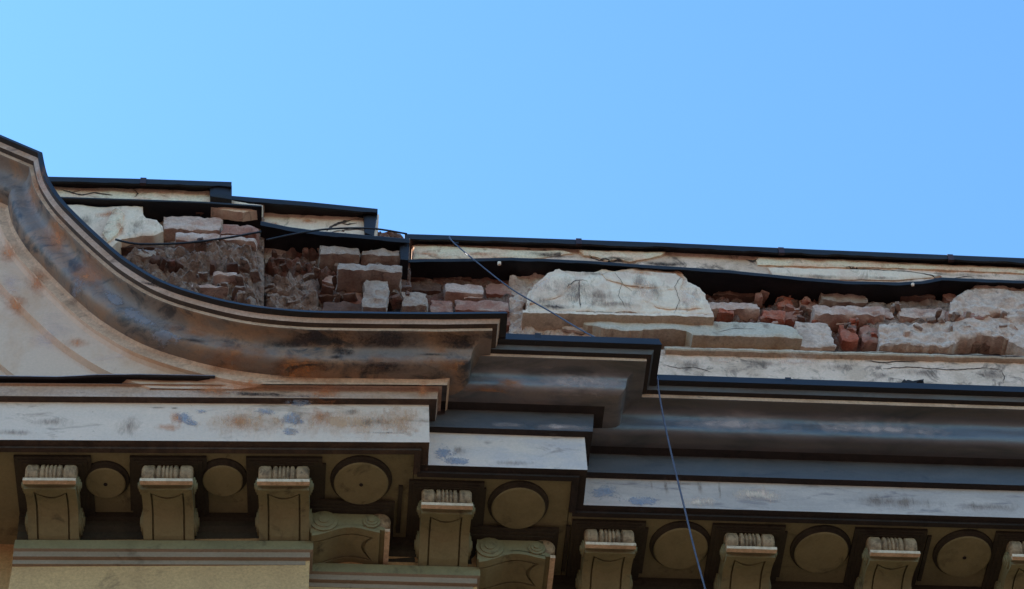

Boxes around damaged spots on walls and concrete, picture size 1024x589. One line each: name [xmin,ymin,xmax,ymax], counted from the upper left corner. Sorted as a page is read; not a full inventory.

peeling [105,290,182,348]
spalling [68,204,363,311]
damp [272,331,321,347]
damp [359,331,403,347]
damp [444,334,474,349]
crack [567,249,628,307]
spalling [705,257,1024,356]
crack [833,351,1024,383]